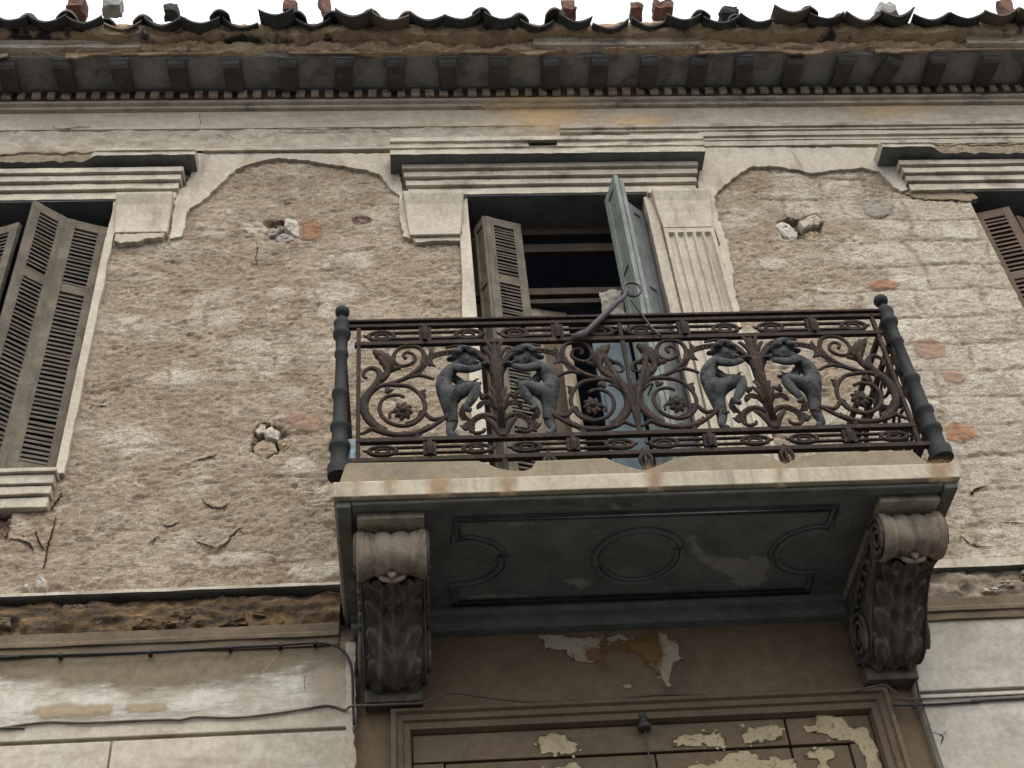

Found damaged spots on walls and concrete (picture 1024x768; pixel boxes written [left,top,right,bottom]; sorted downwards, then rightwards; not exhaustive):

spalling [902,192,978,204]
spalling [243,218,321,244]
spalling [351,216,379,235]
spalling [774,214,822,240]
flaking render [915,337,945,358]
spalling [251,412,321,459]
crack [8,492,62,568]
crack [149,495,243,549]
spalling [219,609,265,628]
peeling [538,632,638,664]
peeling [649,632,685,687]
peeling [672,715,882,768]